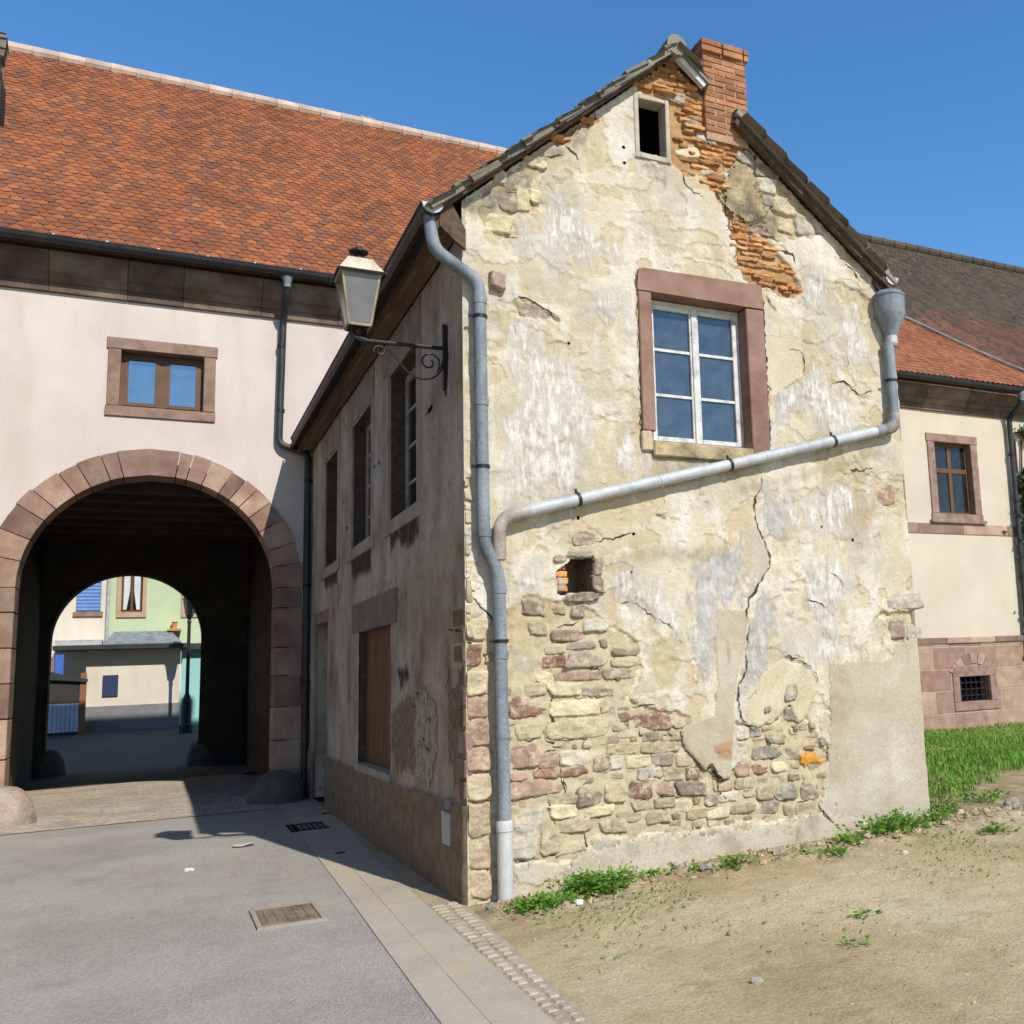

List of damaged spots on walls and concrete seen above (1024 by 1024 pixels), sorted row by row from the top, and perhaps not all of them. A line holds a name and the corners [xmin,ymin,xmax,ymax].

spalling [631,61,876,371]
peeling [497,300,593,506]
peeling [616,428,651,474]
crack [832,340,873,396]
spalling [391,478,498,906]
spalling [506,532,830,868]
crack [737,476,771,733]